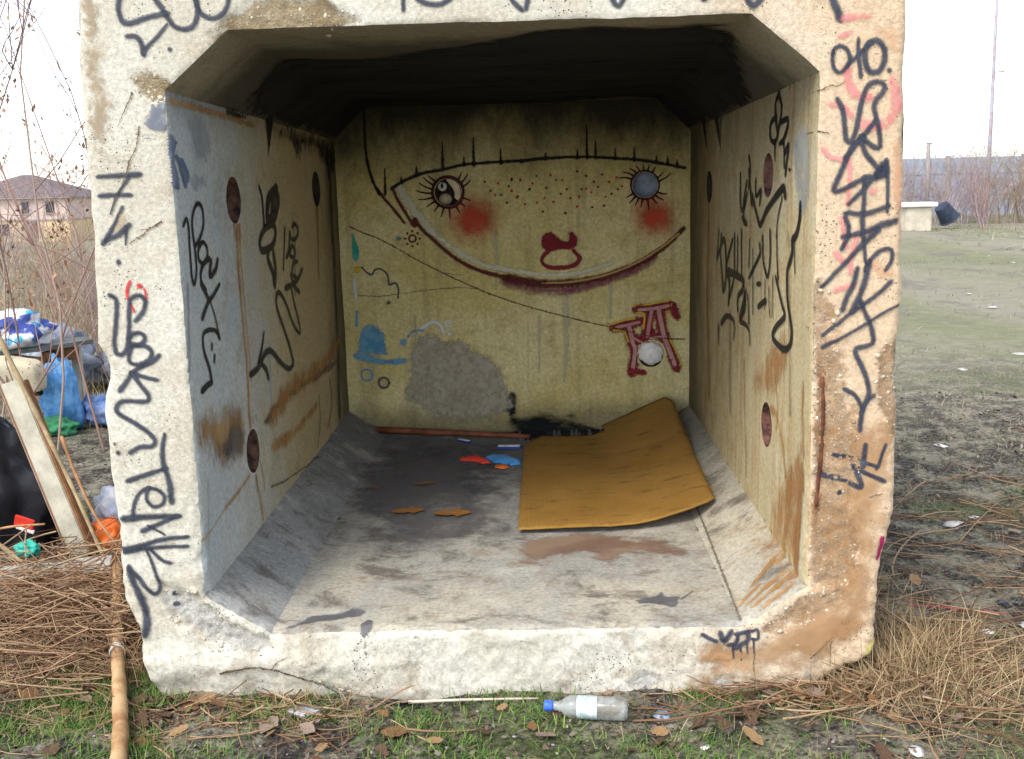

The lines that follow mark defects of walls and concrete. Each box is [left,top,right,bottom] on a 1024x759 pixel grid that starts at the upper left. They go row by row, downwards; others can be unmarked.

corrosion [199,223,252,461]
corrosion [271,338,340,425]
corrosion [700,341,895,688]
spalling [758,277,861,637]